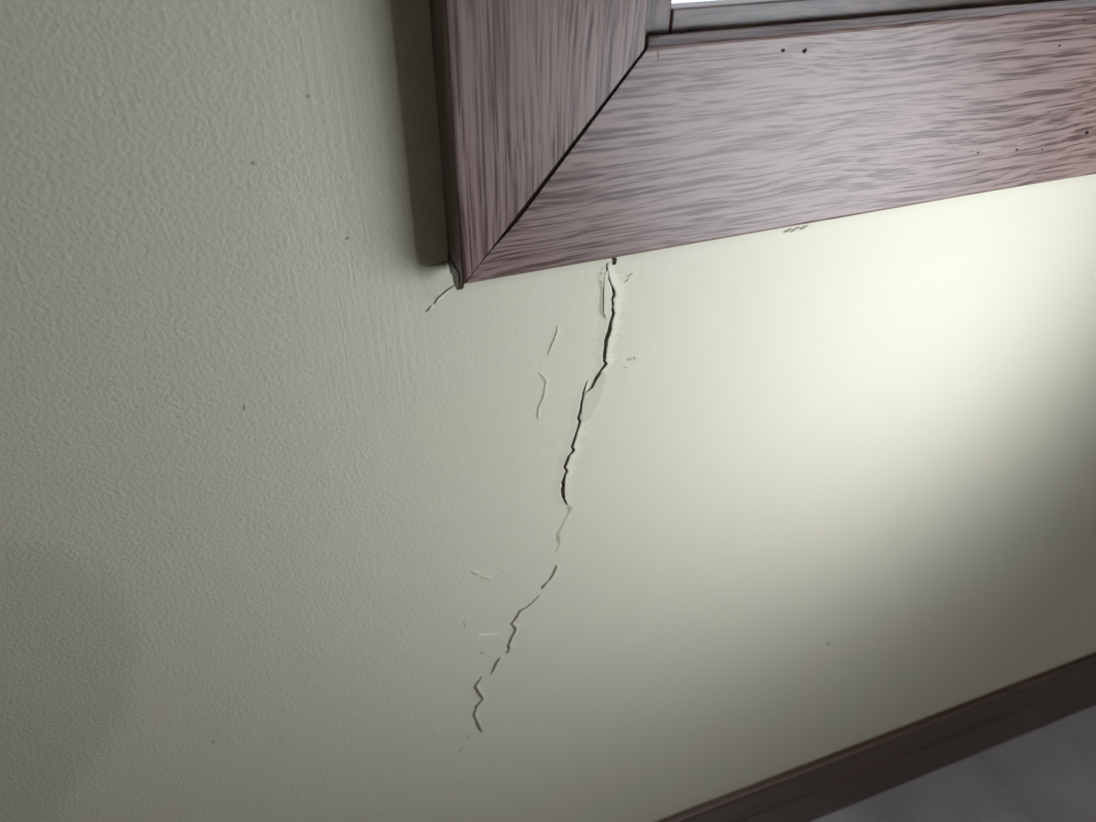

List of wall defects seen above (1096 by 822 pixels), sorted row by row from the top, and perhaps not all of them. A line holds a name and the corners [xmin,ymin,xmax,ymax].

crack [427,261,455,312]
crack [538,258,629,506]
crack [472,564,562,732]